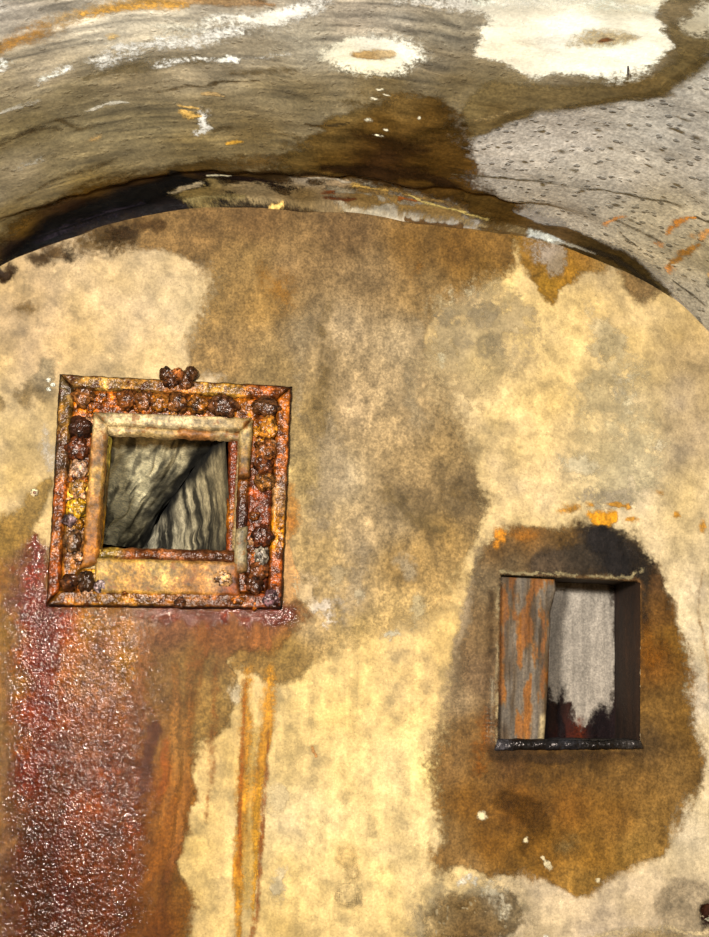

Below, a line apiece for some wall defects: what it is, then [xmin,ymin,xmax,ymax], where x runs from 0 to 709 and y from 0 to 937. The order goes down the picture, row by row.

damp [0,0,709,266]
damp [0,263,18,284]
corrosion [666,217,696,234]
corrosion [665,229,709,272]
damp [80,190,706,937]
corrosion [494,528,533,549]
corrosion [559,501,638,526]
damp [0,478,53,937]
corrosion [0,484,300,937]
spalling [406,880,526,937]
spalling [627,878,709,937]